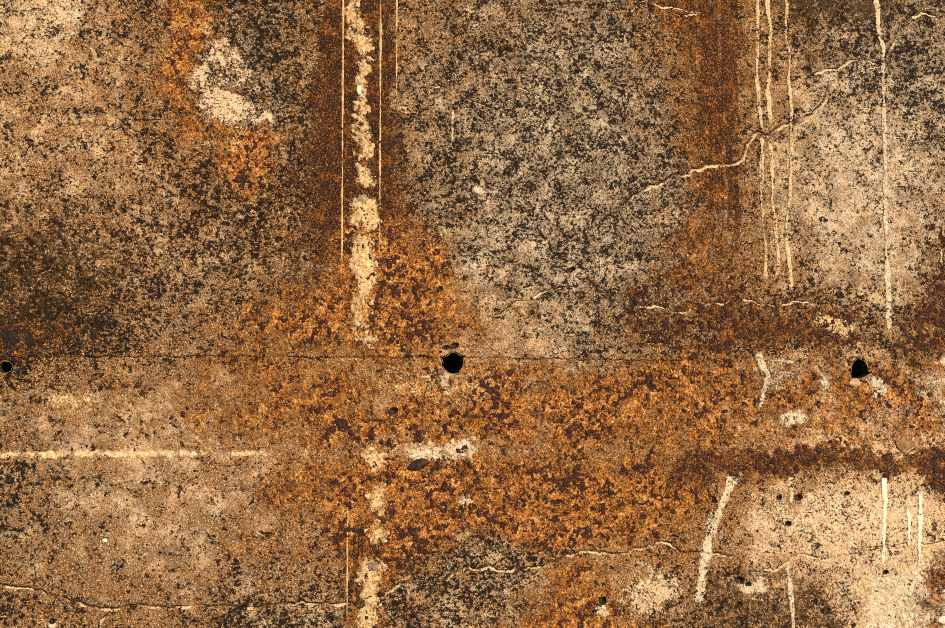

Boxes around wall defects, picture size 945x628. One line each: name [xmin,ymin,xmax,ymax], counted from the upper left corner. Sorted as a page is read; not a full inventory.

crack [631,0,707,20]
corrosion [148,0,290,204]
crack [580,11,936,253]
damp [755,0,906,329]
corrosion [924,224,945,258]
crack [639,295,823,314]
crack [36,353,419,361]
corrosion [36,368,174,444]
crack [0,490,945,628]
corrosion [498,551,649,628]
damp [689,476,859,628]
corrosion [909,548,945,628]